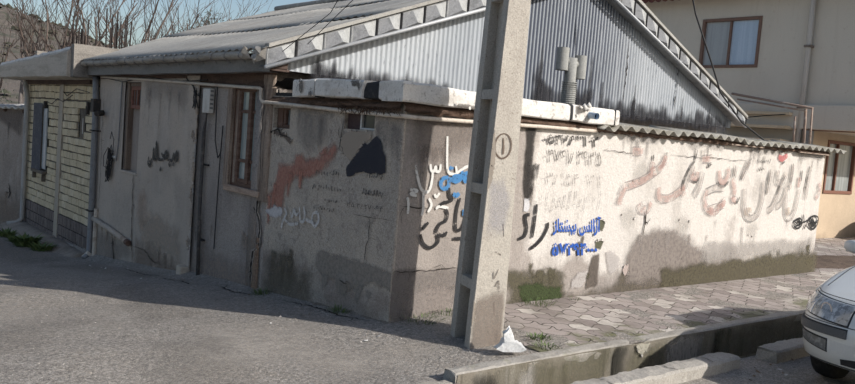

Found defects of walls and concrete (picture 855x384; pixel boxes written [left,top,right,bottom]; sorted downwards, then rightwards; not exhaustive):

water stain [315,251,457,320]
crack [356,205,433,262]
water stain [529,264,555,284]
water stain [571,230,811,289]